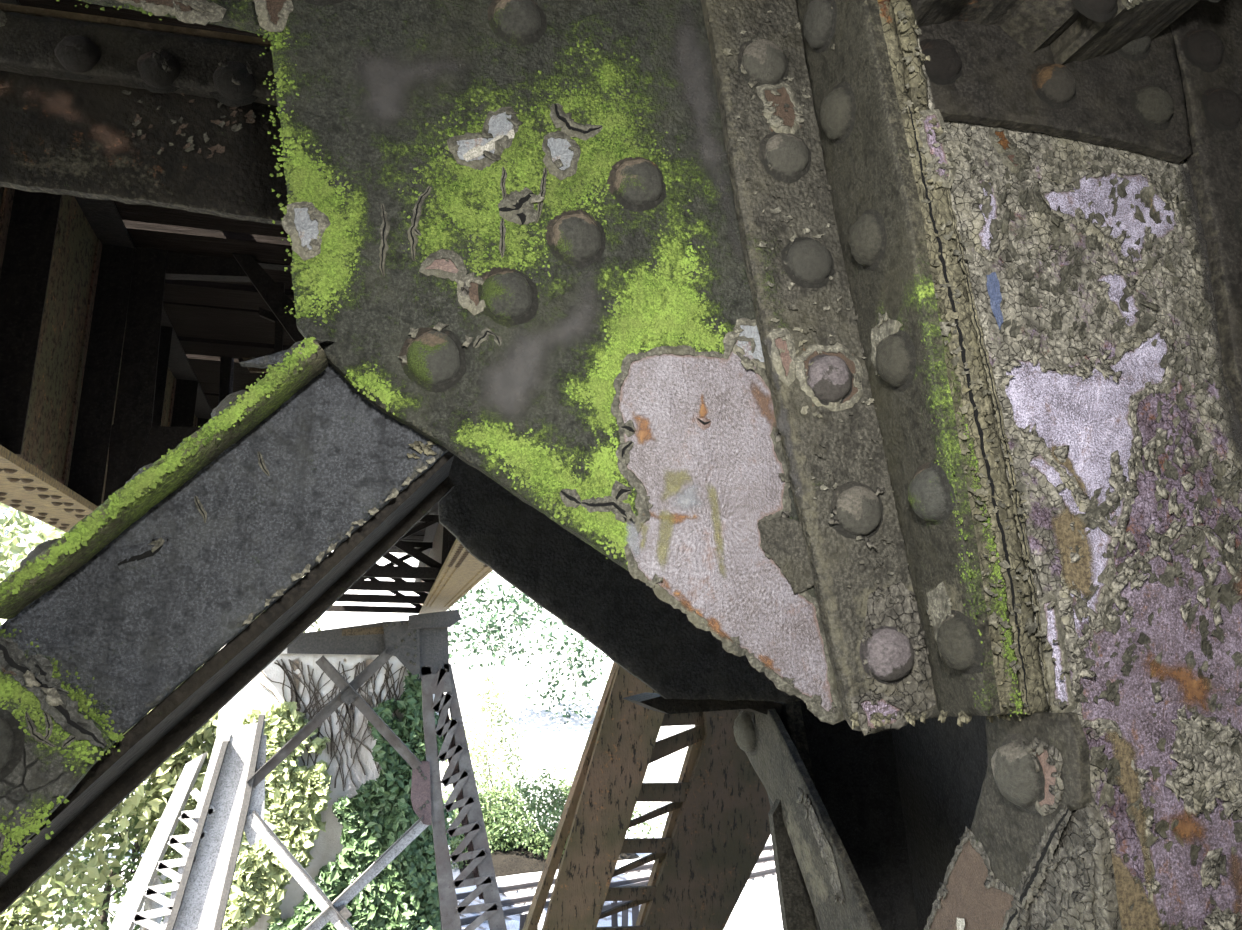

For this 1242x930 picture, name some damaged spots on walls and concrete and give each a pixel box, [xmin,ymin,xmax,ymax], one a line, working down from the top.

peeling [447,107,523,170]
peeling [542,130,581,180]
peeling [722,48,811,148]
peeling [611,165,972,736]
peeling [897,11,1242,930]
crack [0,636,107,749]
peeling [796,786,845,905]